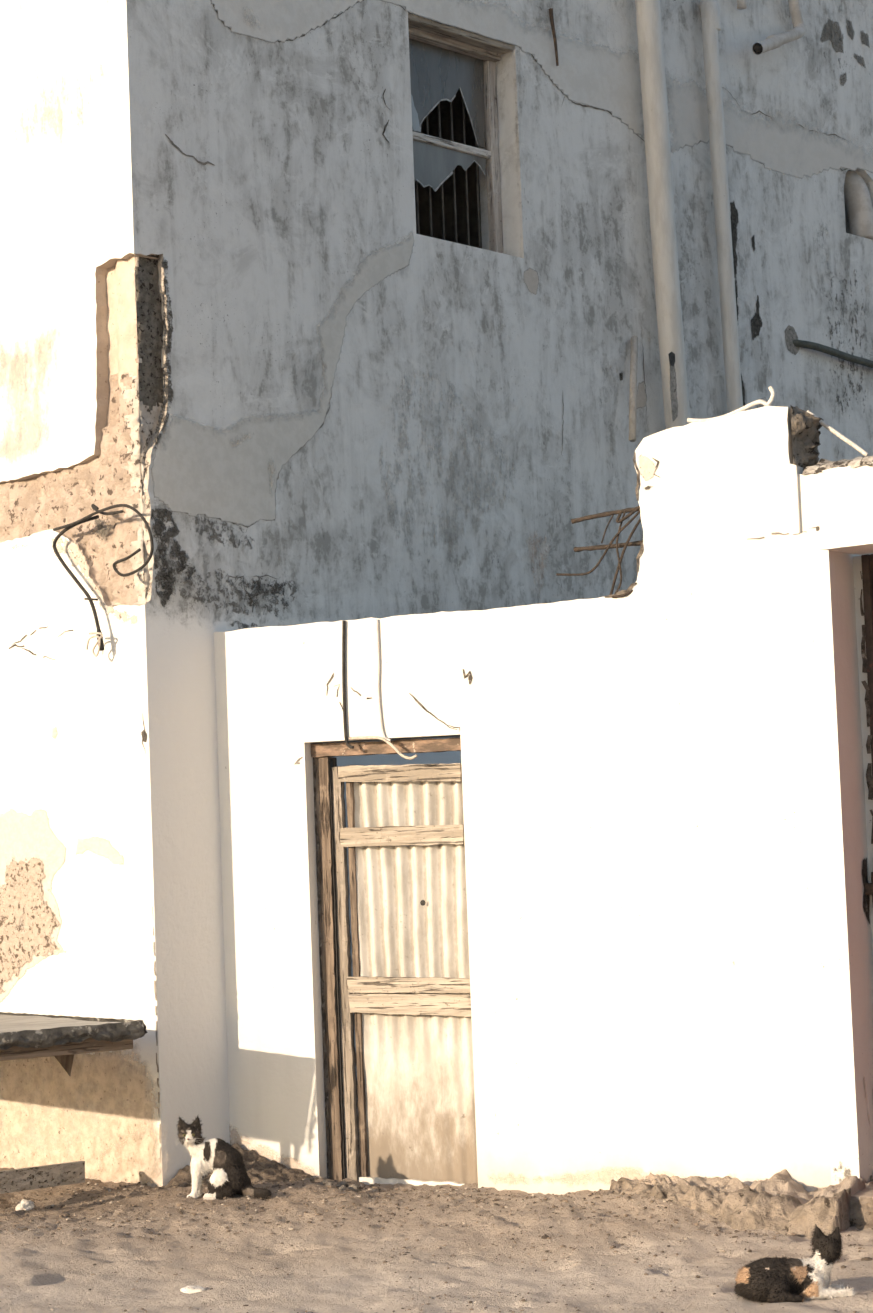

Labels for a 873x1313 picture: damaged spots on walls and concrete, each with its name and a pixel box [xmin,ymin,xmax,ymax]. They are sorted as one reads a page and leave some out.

crack [165,134,215,166]
water stain [730,202,762,340]
water stain [826,264,866,411]
spalling [0,255,164,624]
spalling [633,452,656,501]
water stain [151,508,297,629]
spalling [605,543,643,598]
peeling [0,809,124,1003]